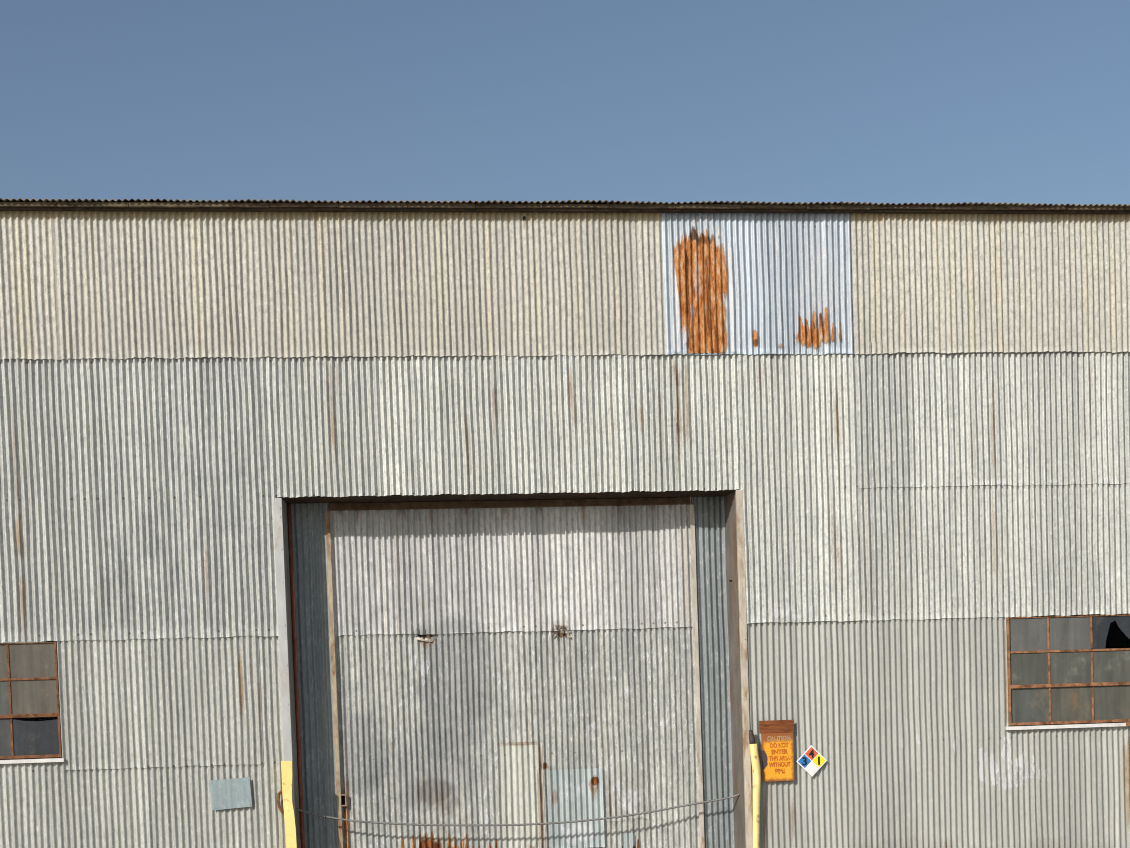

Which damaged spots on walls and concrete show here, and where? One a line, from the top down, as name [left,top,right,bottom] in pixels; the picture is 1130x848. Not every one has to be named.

rust [671,216,736,353]
rust [796,243,843,348]
rust [401,832,498,848]